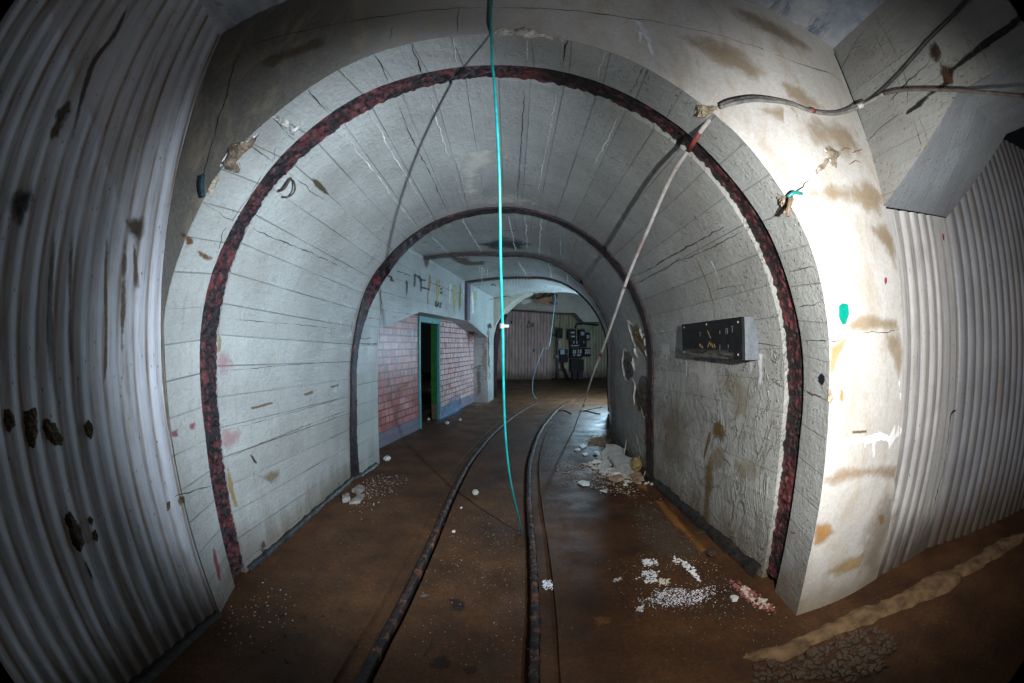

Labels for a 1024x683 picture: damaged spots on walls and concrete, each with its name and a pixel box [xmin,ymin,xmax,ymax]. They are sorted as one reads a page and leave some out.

rust [51,12,126,139]
spalling [207,134,259,196]
crack [204,7,931,282]
peeling [816,145,841,174]
leakage [852,186,881,208]
spalling [622,320,647,421]
rust [4,407,63,448]
rust [83,420,93,439]
rust [64,511,99,579]